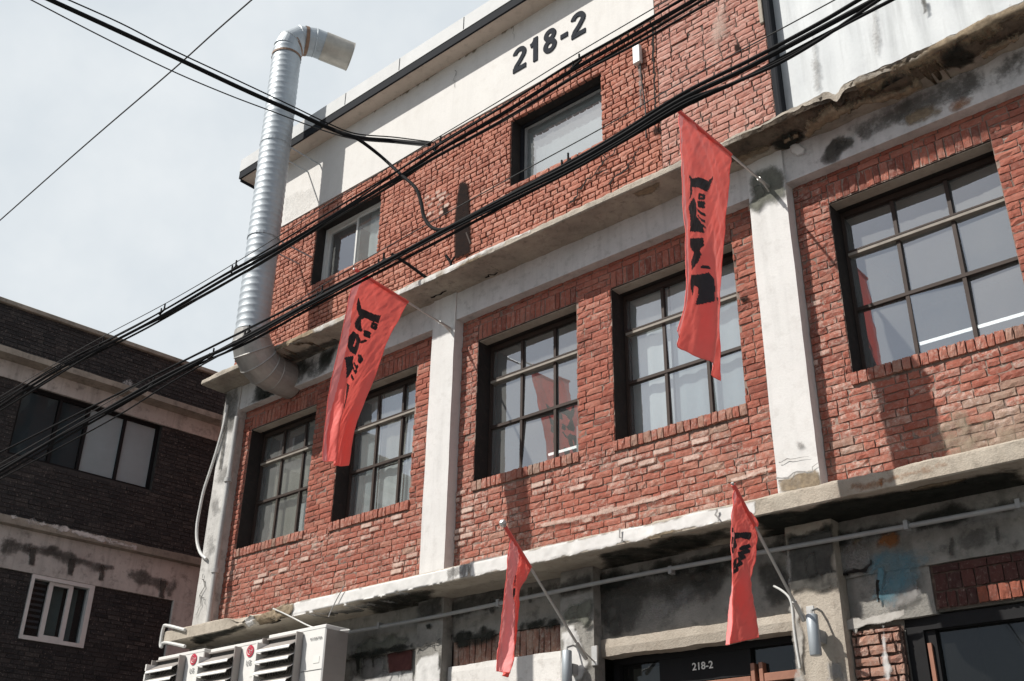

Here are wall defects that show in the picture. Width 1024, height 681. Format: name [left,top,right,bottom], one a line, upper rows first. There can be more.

spalling [736,3,1024,164]
leakage [859,72,977,137]
crack [776,456,819,479]
leakage [1,539,113,581]
leakage [756,470,1024,605]
leakage [131,570,176,599]
leakage [349,634,412,681]
mould [451,626,496,648]